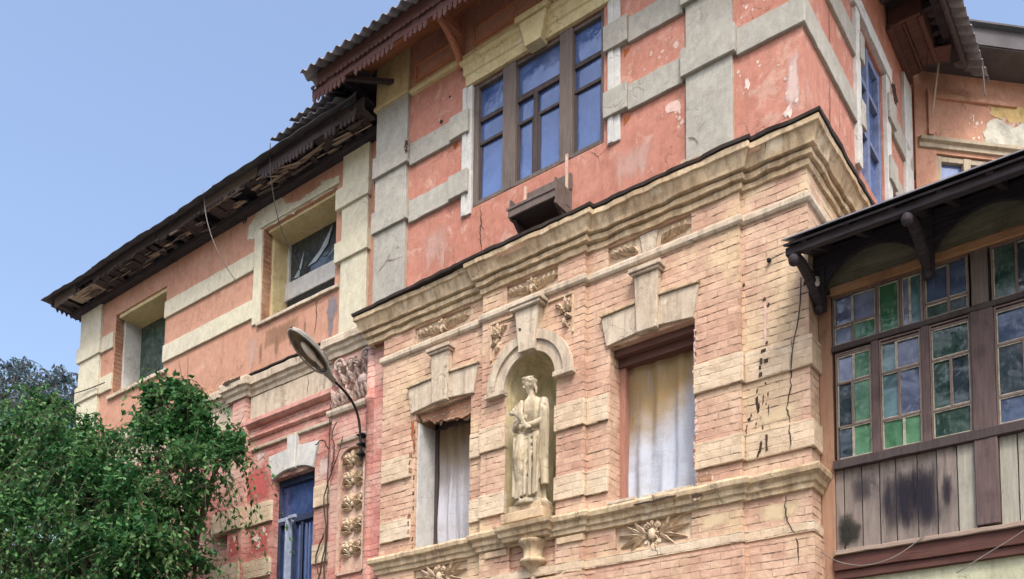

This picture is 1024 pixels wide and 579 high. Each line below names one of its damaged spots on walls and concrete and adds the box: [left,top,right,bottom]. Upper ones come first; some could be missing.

peeling [662,99,685,129]
peeling [777,53,799,118]
spalling [969,106,1024,147]
spalling [745,341,769,457]
crack [785,340,793,450]
leakage [884,469,951,522]
crack [784,496,799,563]
mould [839,514,861,545]